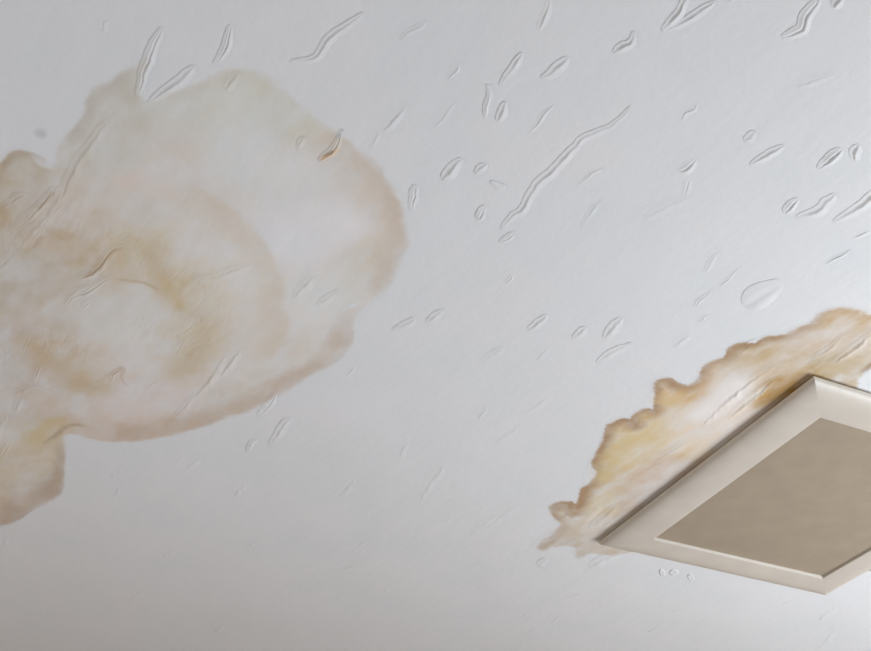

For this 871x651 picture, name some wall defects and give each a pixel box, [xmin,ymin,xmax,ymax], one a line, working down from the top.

damp [0,54,413,527]
damp [531,304,871,560]